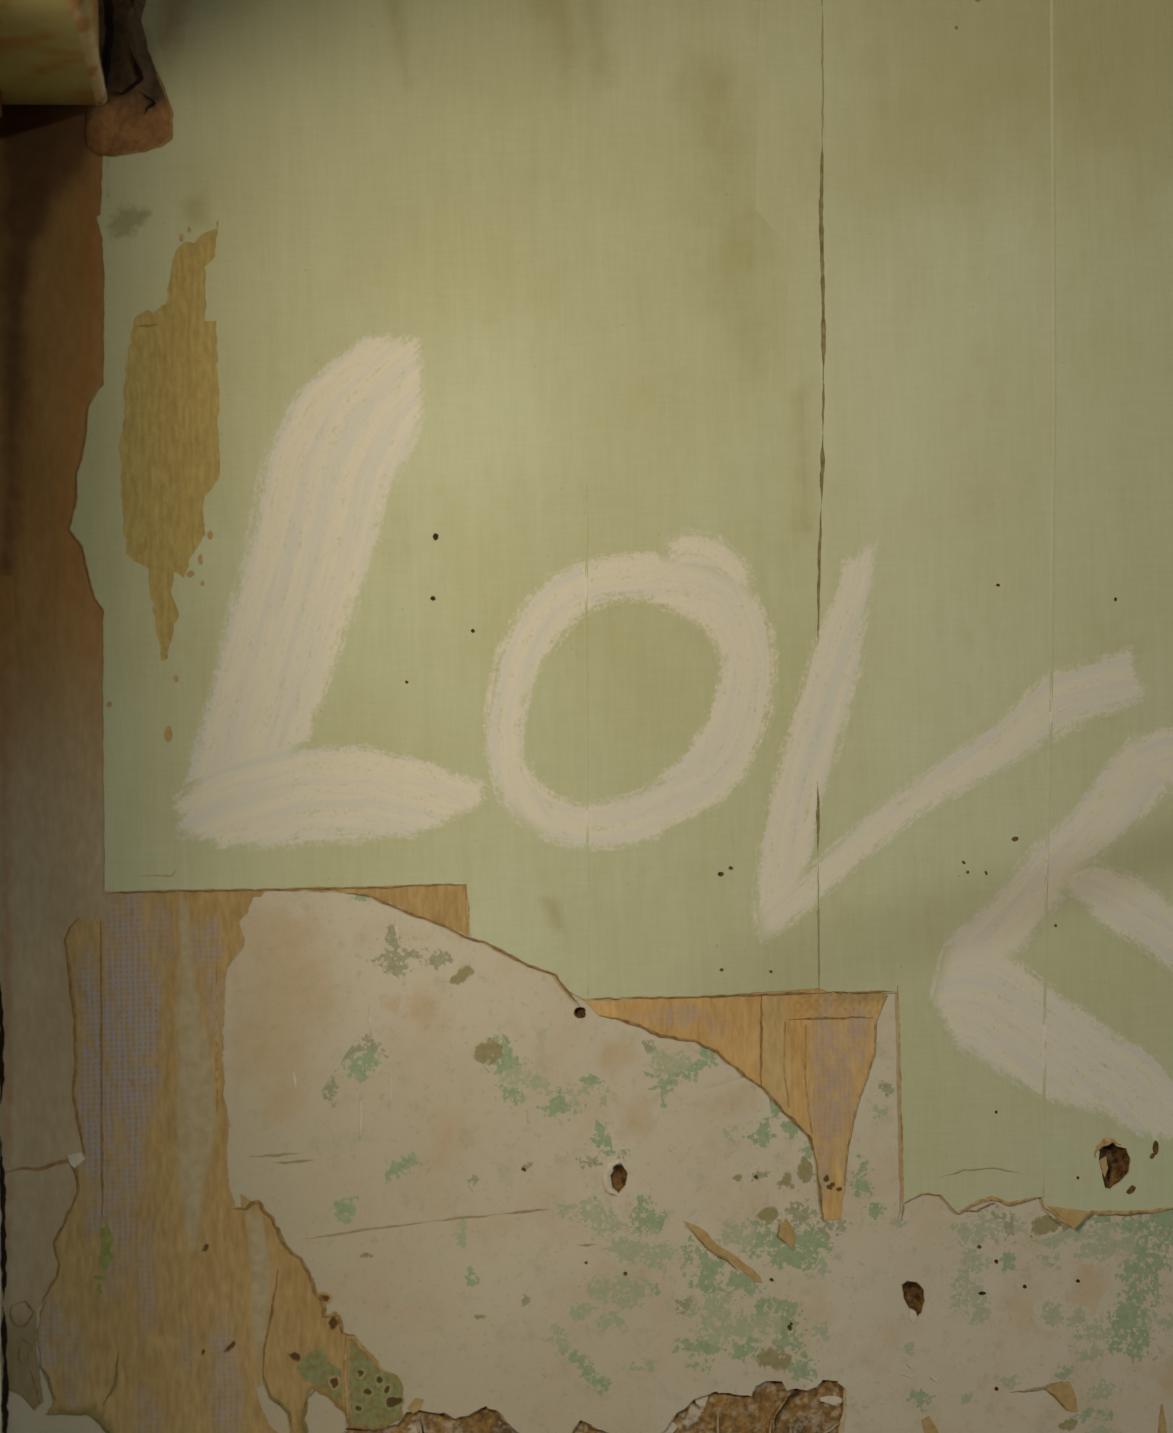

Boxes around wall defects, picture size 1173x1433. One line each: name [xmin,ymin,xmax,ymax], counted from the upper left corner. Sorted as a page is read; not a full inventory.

peeling [119,221,220,661]
peeling [365,913,479,987]
peeling [467,1037,503,1069]
peeling [535,1067,605,1125]
peeling [1099,1156,1108,1177]
spalling [548,1098,896,1433]
peeling [947,1205,1097,1281]
peeling [1096,1219,1173,1375]
spalling [344,1406,519,1433]
peeling [1054,1417,1078,1433]